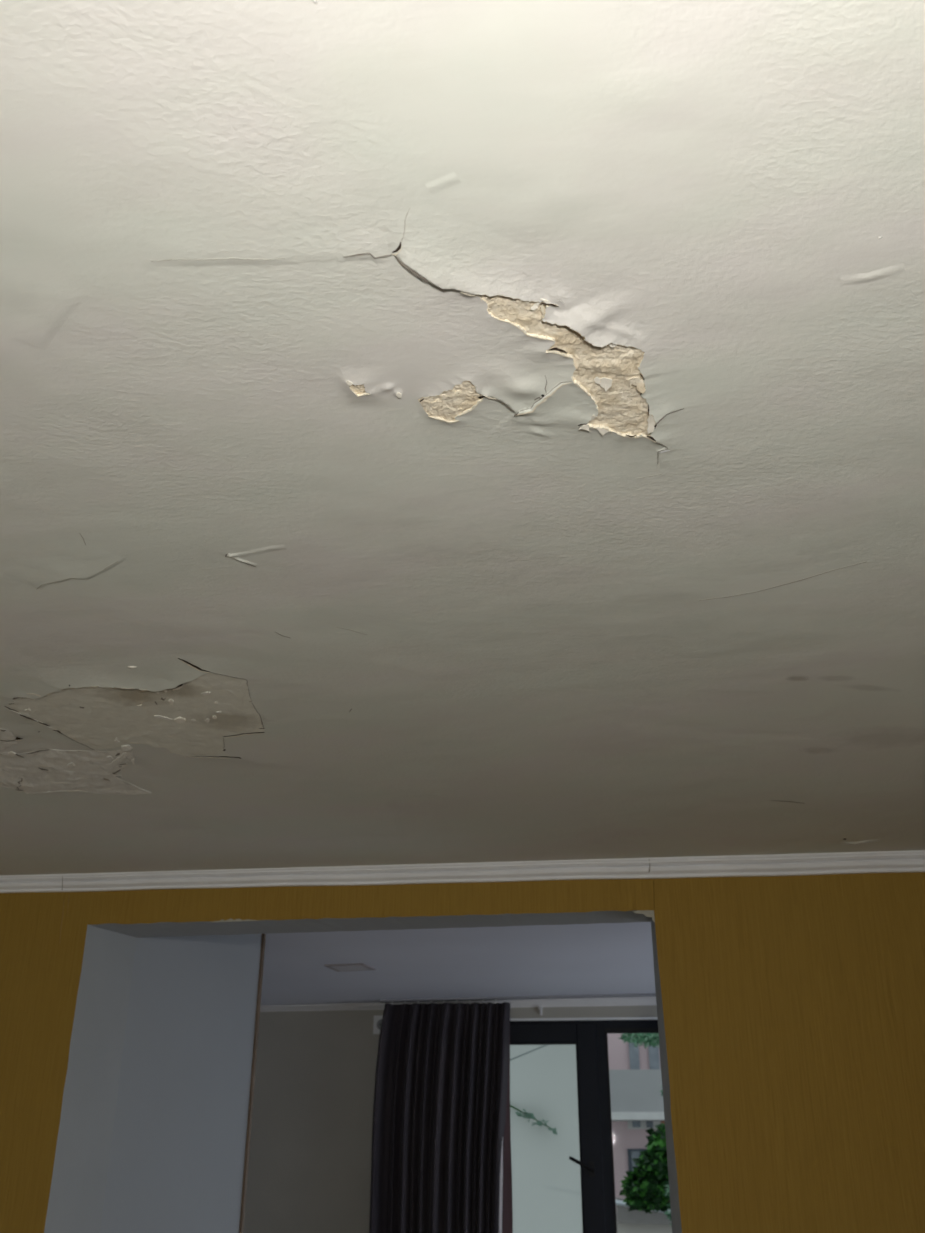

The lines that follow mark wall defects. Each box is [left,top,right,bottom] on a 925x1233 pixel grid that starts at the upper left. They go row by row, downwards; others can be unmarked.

crack [392,209,427,282]
peeling [328,204,729,502]